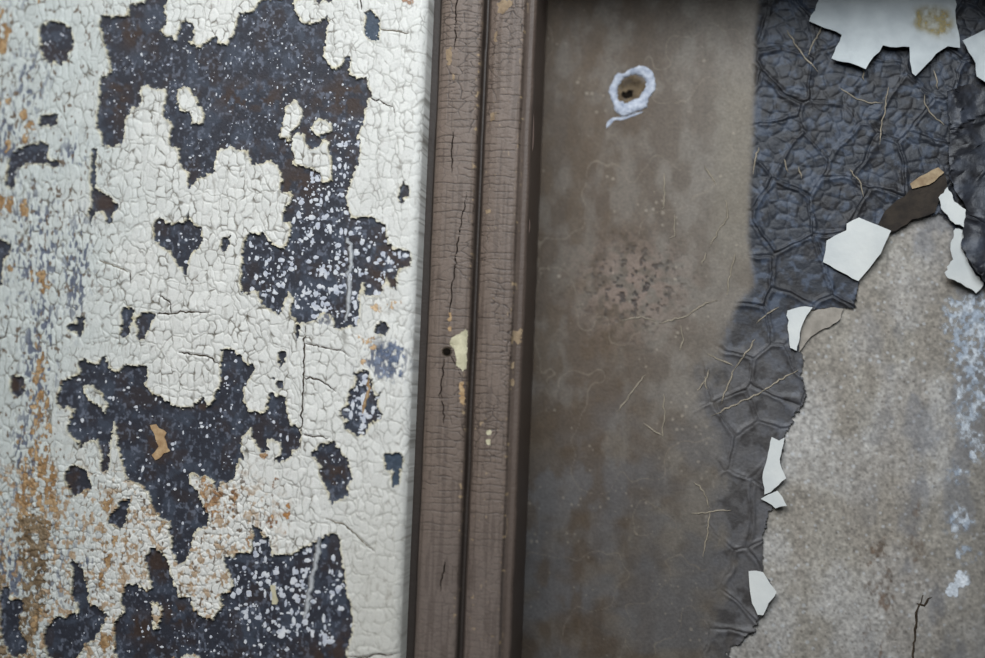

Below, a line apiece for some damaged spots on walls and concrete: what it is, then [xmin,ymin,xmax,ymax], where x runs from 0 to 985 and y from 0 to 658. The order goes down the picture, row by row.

spalling [606,66,656,128]
peeling [87,0,412,342]
crack [149,296,209,315]
crack [300,325,345,448]
spalling [703,0,985,658]
water stain [943,294,985,482]
corrosion [0,335,60,658]
corrosion [98,492,118,590]
peeling [43,348,353,658]
water stain [945,507,974,597]
corrosion [98,632,113,652]
crack [911,595,932,658]